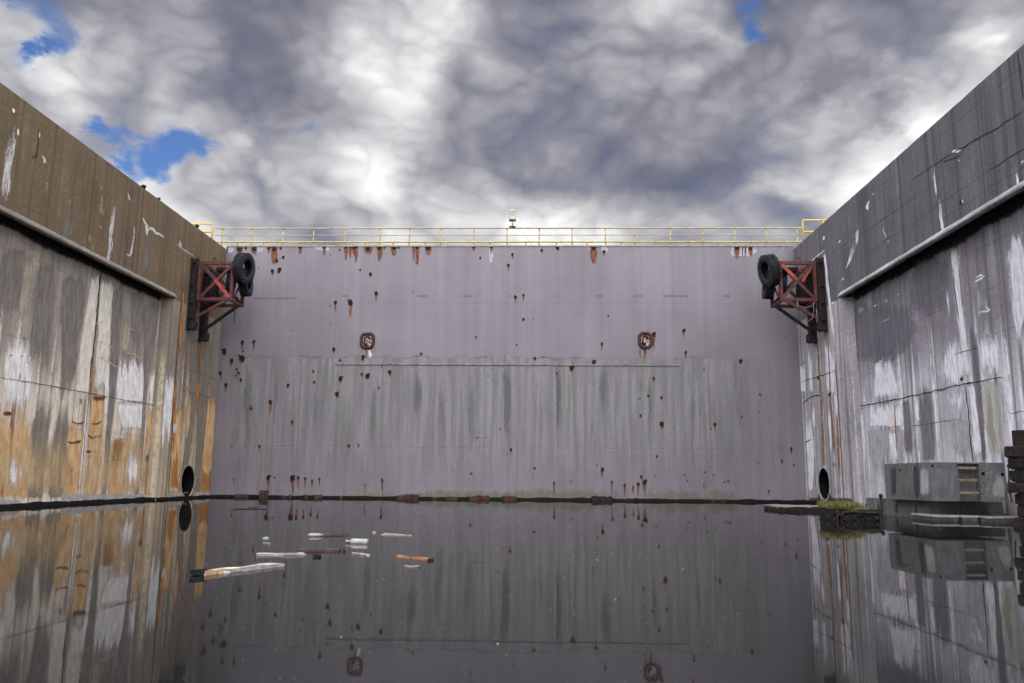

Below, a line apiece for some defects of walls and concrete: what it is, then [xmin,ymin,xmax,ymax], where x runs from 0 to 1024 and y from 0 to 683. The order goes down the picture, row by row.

crack [834,53,1024,256]
corrosion [339,247,431,277]
corrosion [590,247,606,263]
corrosion [0,396,153,498]
water stain [0,185,212,504]
corrosion [170,334,216,492]
water stain [237,349,740,463]
corrosion [596,464,656,495]
corrosion [817,334,836,466]
crack [860,348,1000,461]
water stain [854,169,1024,513]